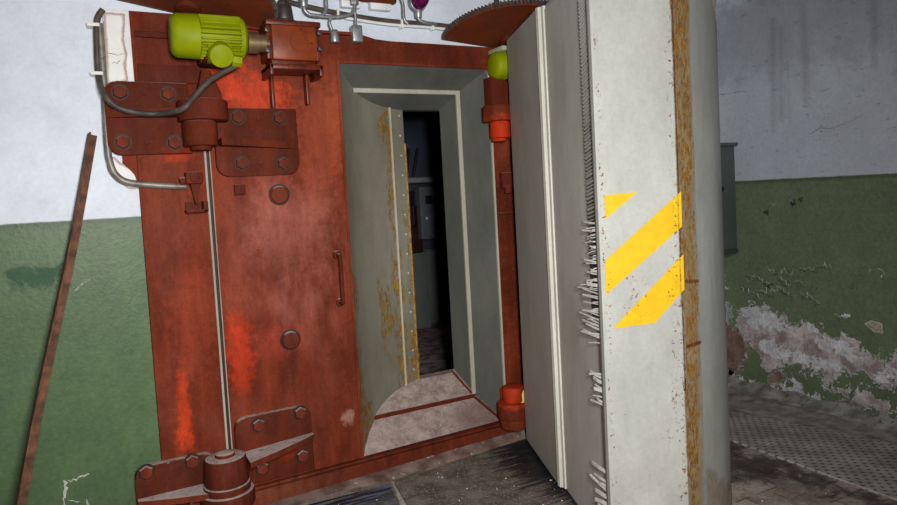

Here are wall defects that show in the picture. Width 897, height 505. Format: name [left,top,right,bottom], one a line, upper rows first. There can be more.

rust [377,111,408,237]
rust [378,249,420,386]
rust [670,0,701,505]
peeling [726,300,897,417]